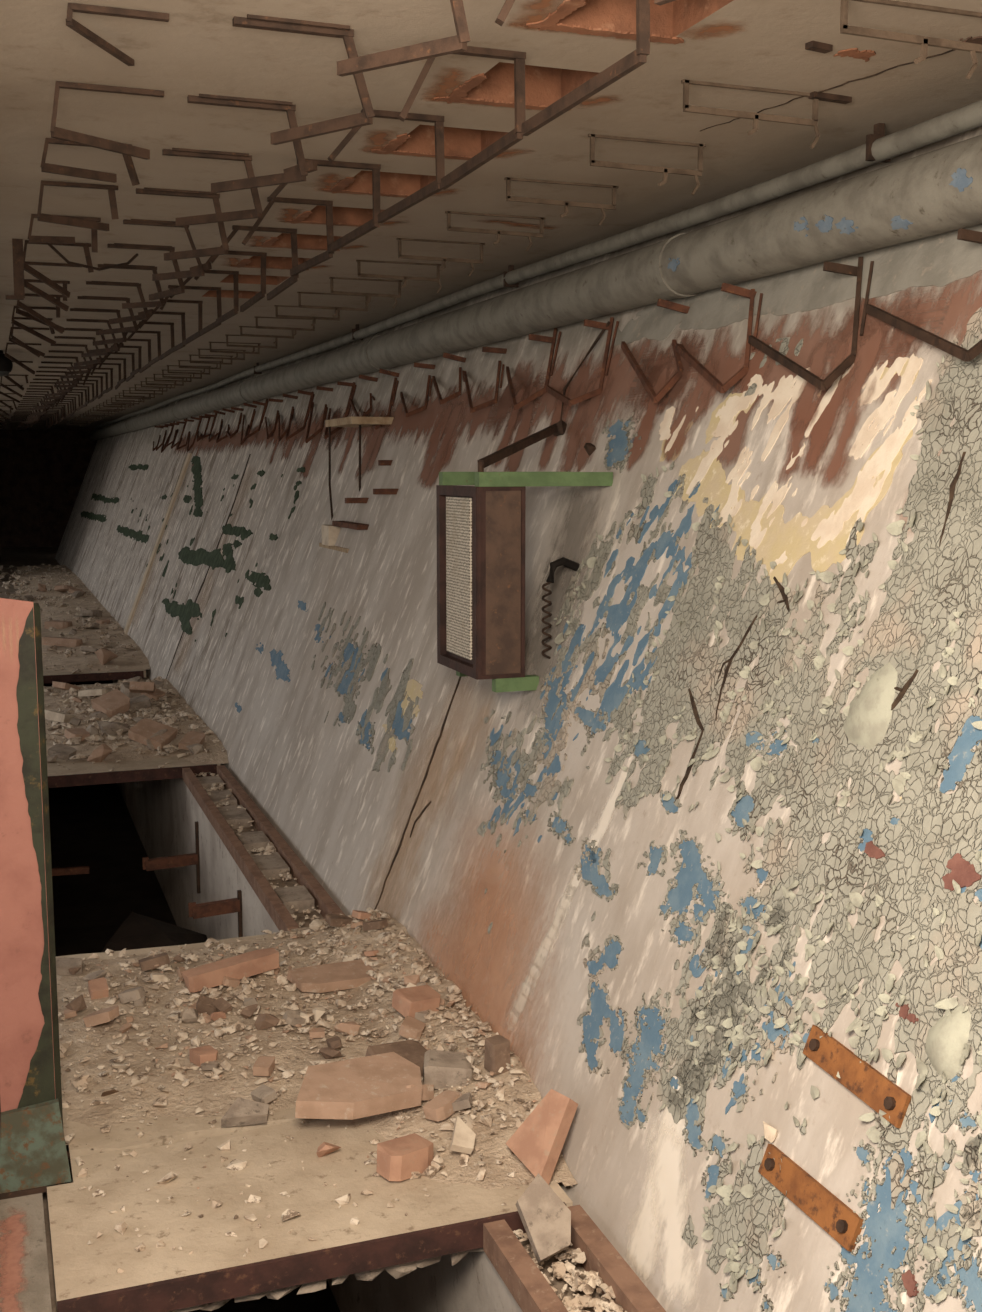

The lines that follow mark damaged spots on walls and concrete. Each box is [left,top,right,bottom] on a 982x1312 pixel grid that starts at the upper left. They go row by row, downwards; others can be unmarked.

rust [175,273,982,488]
peeling [81,493,271,642]
peeling [160,456,208,517]
peeling [281,467,305,519]
peeling [477,307,982,1312]